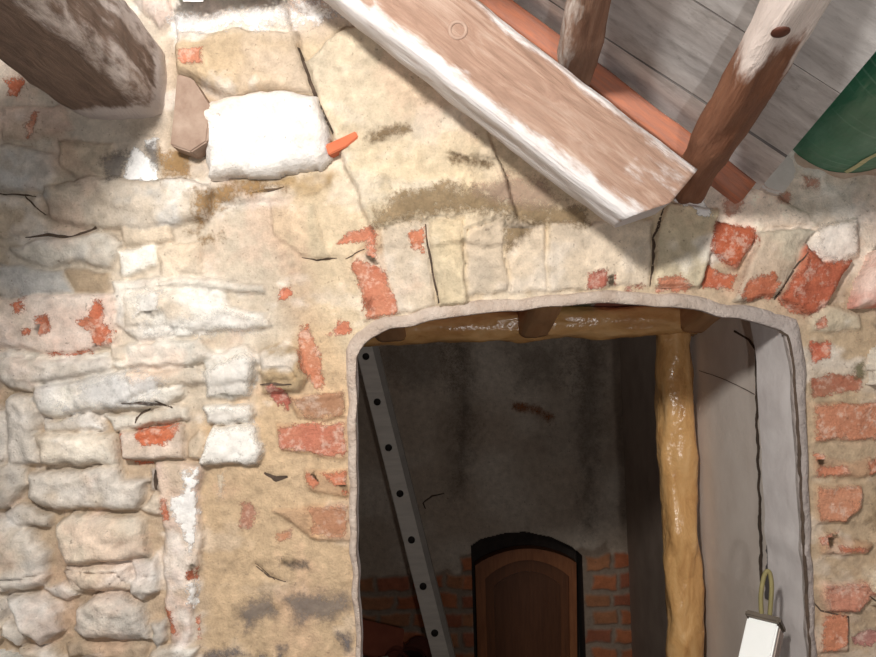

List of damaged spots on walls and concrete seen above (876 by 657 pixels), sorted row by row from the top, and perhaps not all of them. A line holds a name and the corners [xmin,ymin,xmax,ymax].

crack [297,47,334,134]
water stain [370,124,412,142]
water stain [448,153,489,168]
water stain [373,175,591,252]
crack [650,208,664,286]
crack [699,330,763,580]
crack [779,330,849,657]